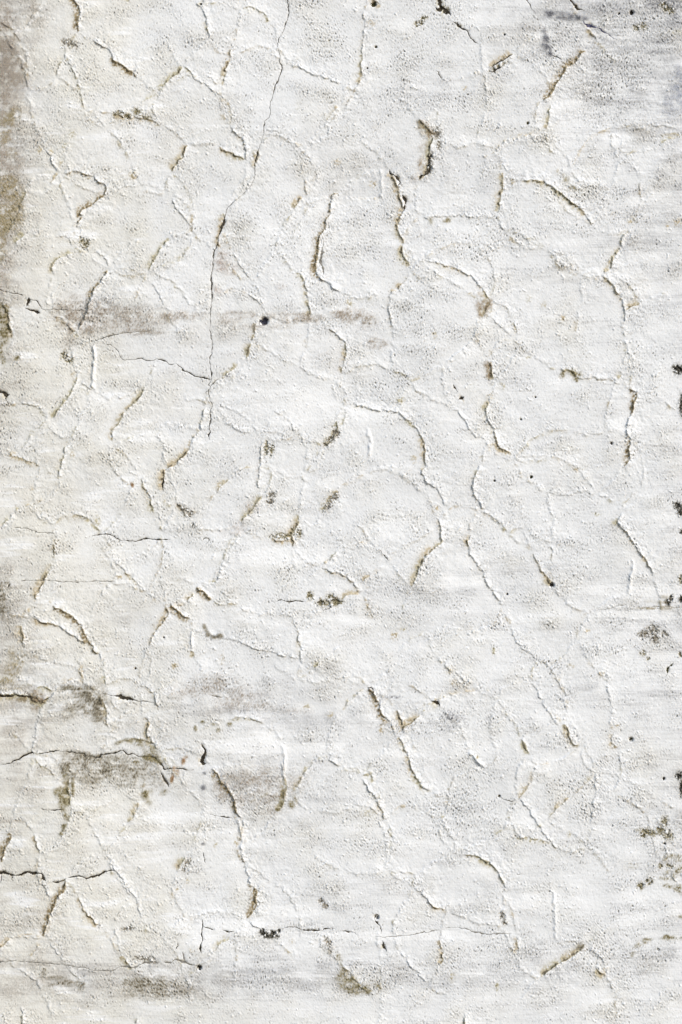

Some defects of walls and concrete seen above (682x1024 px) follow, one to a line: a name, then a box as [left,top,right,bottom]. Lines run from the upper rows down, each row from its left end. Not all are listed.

crack [436,0,477,43]
damp [0,7,23,262]
crack [389,154,432,210]
crack [96,0,289,437]
crack [0,289,84,314]
crack [0,693,50,702]
crack [103,693,153,703]
crack [7,745,207,787]
damp [54,787,70,835]
crack [0,870,114,883]
crack [0,919,234,971]
crack [283,921,512,951]